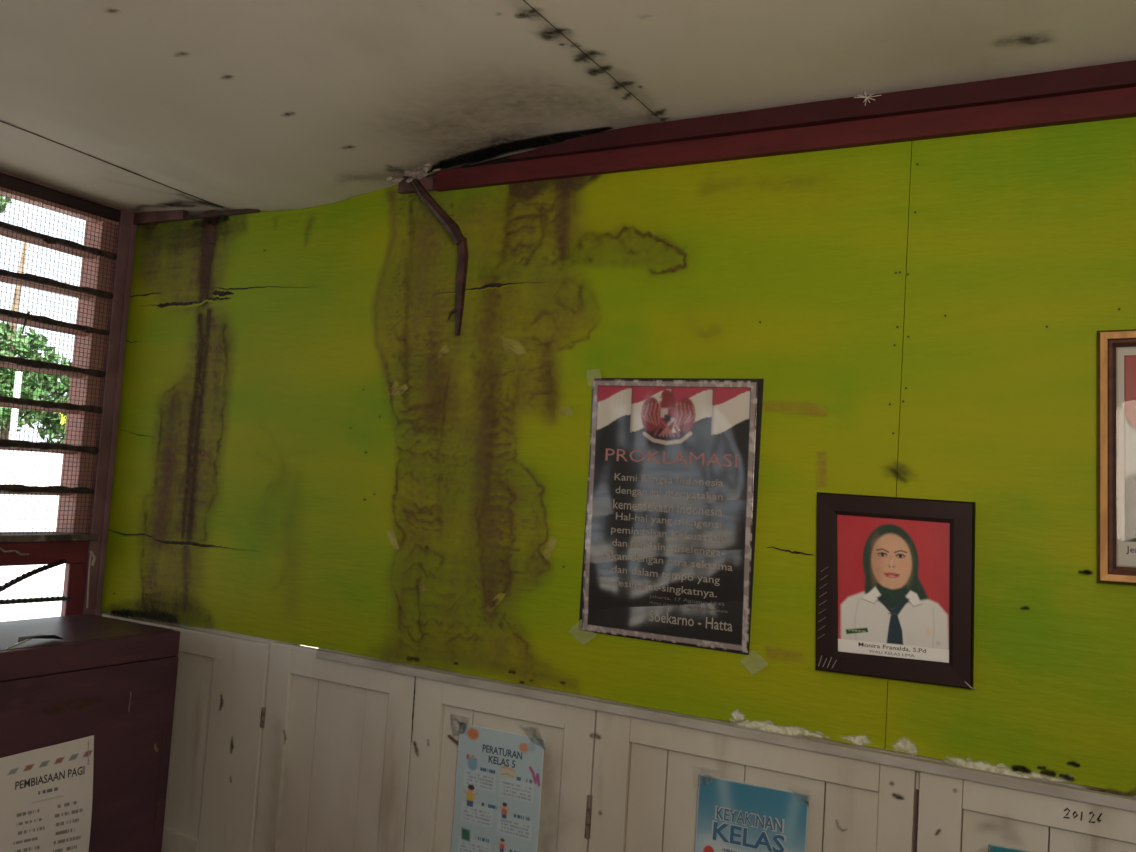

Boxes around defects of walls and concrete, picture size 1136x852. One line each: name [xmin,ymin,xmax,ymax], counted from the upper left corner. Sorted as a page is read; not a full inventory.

leakage [542,29,565,45]
leakage [575,51,610,76]
leakage [606,227,686,274]
crack [130,286,306,310]
leakage [109,197,245,625]
crack [108,530,262,553]
peeling [729,711,870,745]
peeling [894,738,917,753]
peeling [943,757,1071,782]